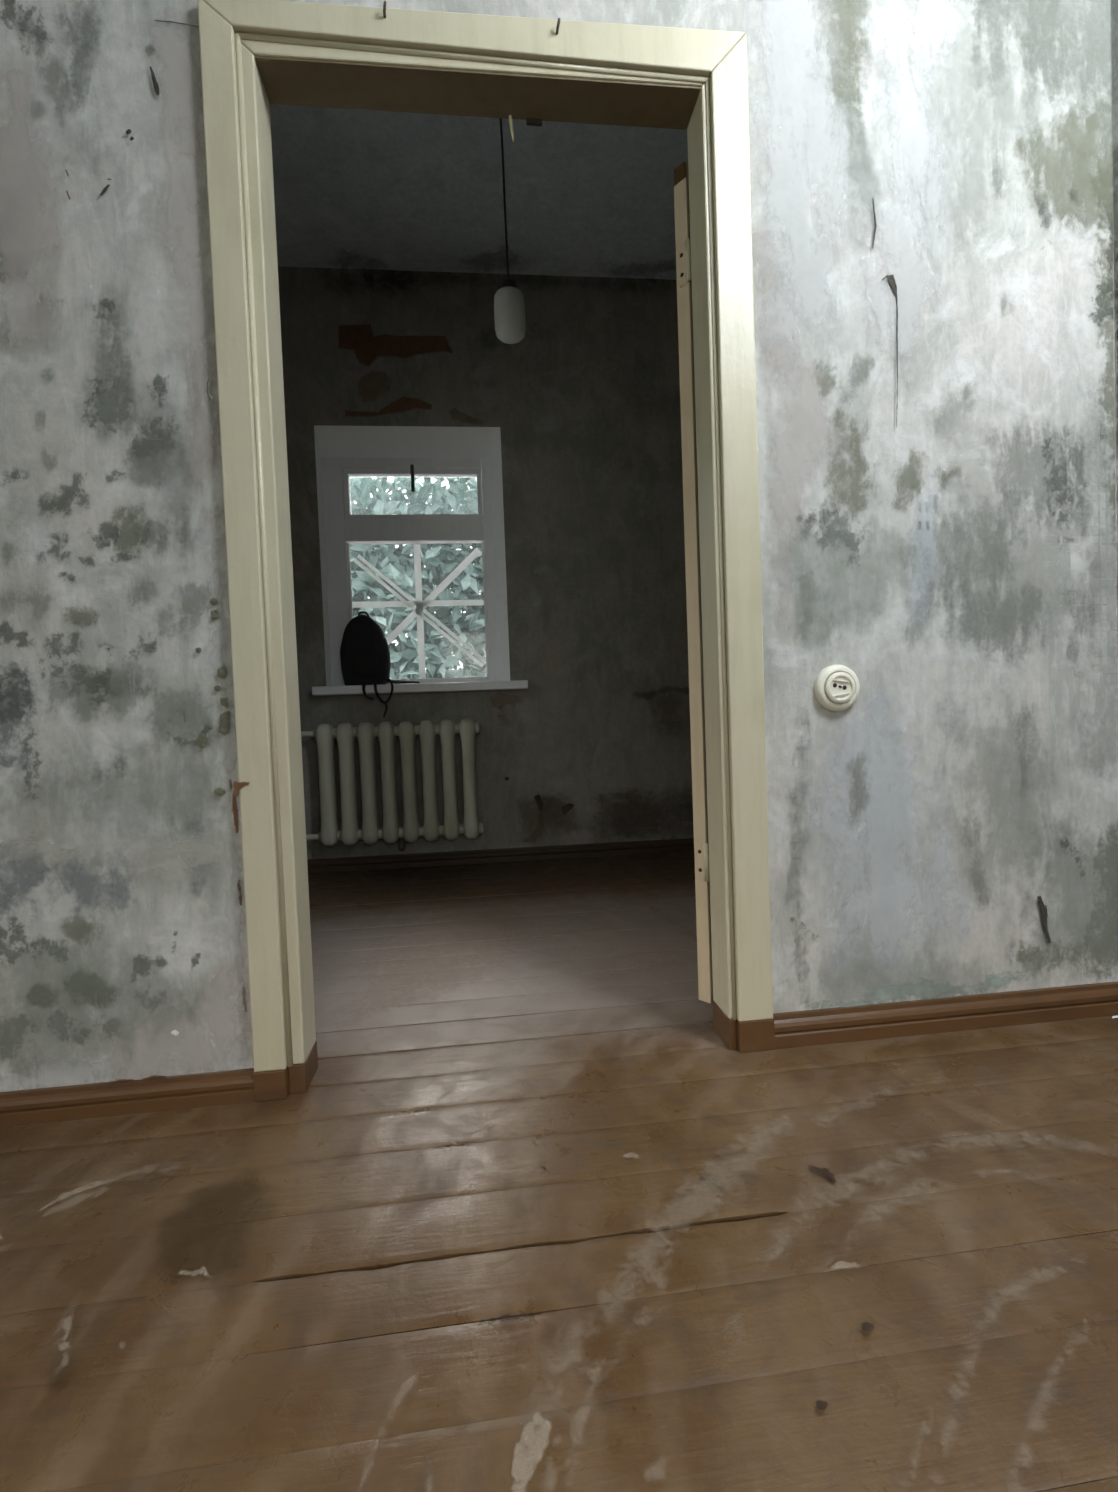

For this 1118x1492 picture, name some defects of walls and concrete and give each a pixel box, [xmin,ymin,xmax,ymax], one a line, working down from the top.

water stain [39,475,88,514]
water stain [40,509,150,581]
water stain [85,375,178,458]
flaking render [337,323,485,425]
water stain [800,412,868,564]
water stain [897,423,989,576]
water stain [1019,100,1118,540]
water stain [0,610,113,795]
water stain [0,841,128,1056]
water stain [132,932,177,1010]
water stain [812,978,964,1008]
water stain [982,830,1118,989]